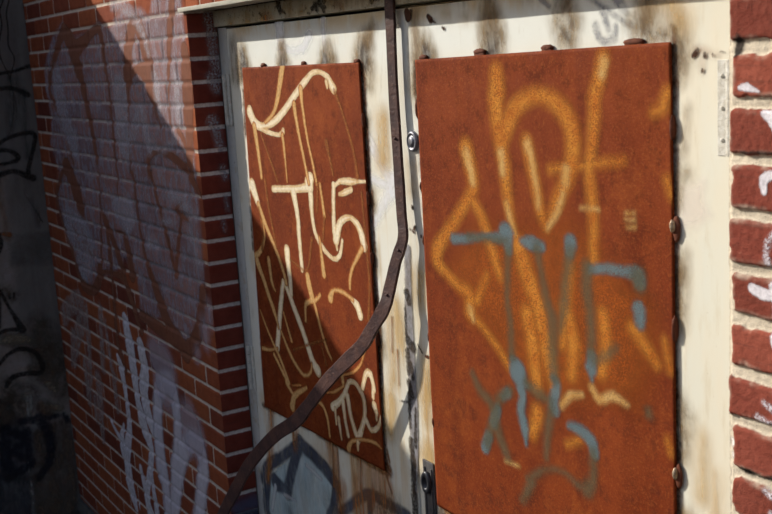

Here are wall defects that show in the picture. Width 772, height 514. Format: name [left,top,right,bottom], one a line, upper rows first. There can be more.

rust [404,8,436,100]
rust [353,28,386,309]
rust [319,302,403,514]
peeling [402,244,418,514]
rust [423,371,431,421]
rust [675,343,687,464]